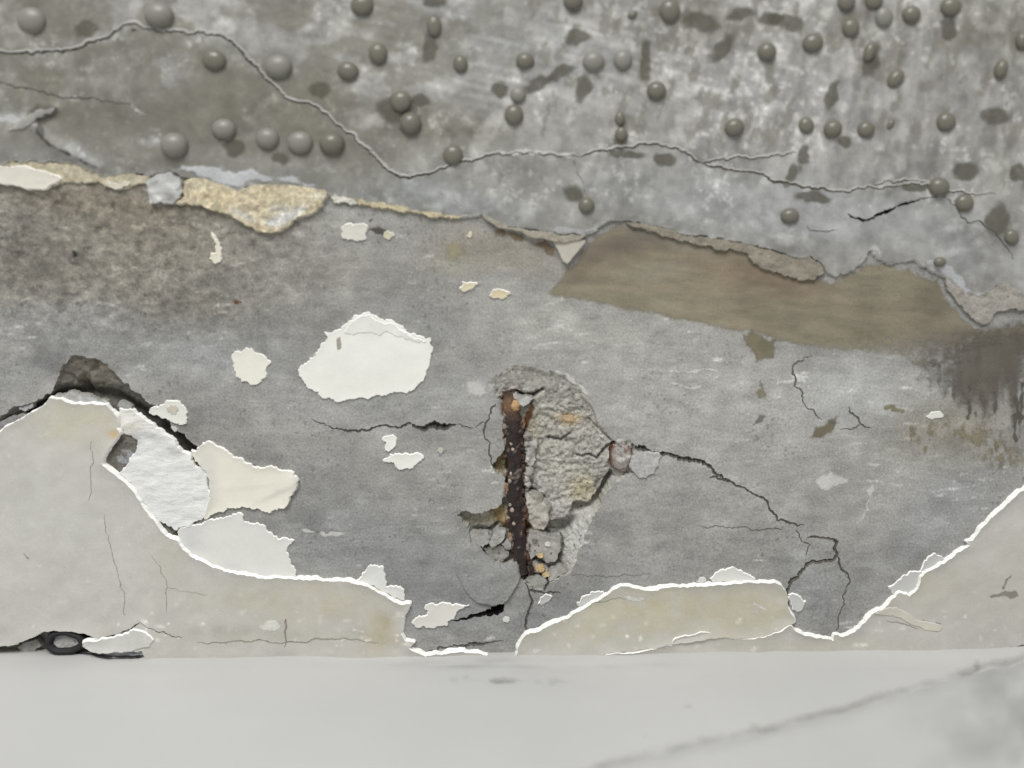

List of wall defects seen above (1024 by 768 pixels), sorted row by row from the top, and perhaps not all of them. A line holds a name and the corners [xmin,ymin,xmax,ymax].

crack [0,20,1013,258]
peeling [0,0,1024,295]
peeling [0,355,488,659]
peeling [231,347,271,385]
peeling [298,312,433,402]
crack [312,403,496,469]
corrosion [493,390,535,575]
spalling [487,364,662,605]
crack [631,444,851,630]
peeling [515,485,1024,656]
damp [550,224,1024,468]
crack [791,356,871,430]